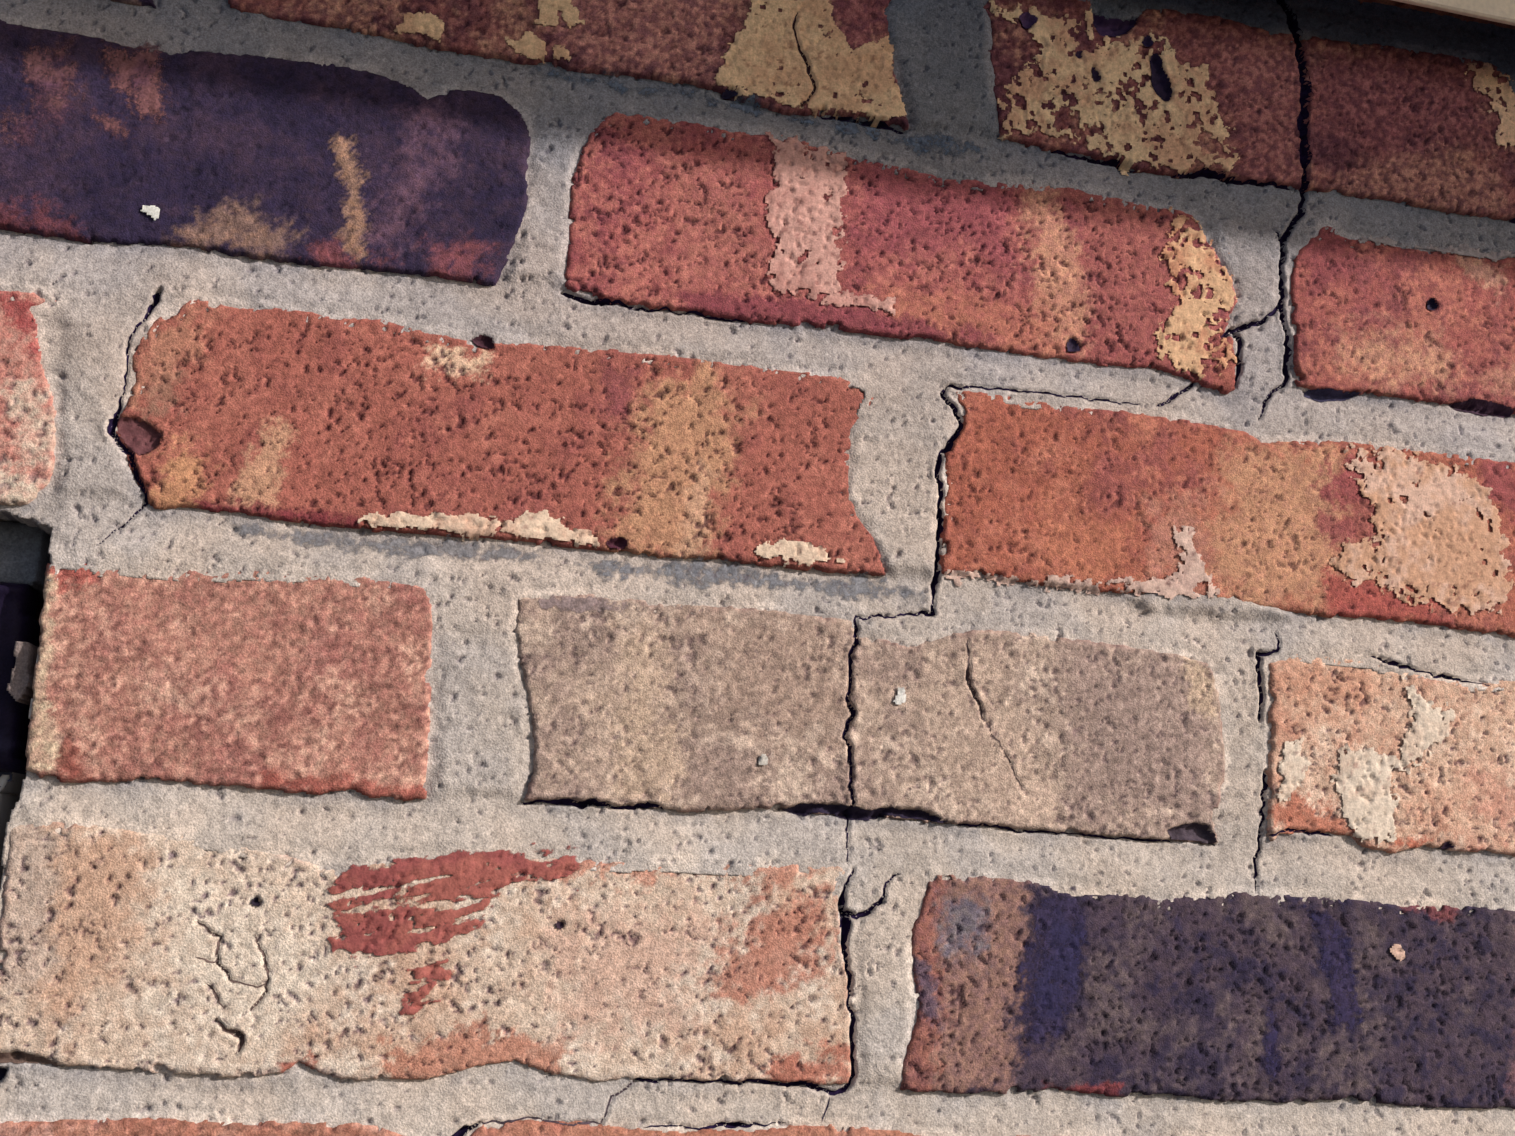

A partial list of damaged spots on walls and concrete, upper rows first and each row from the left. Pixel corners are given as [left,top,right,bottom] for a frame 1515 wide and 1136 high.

peeling [394,11,445,42]
peeling [505,0,585,64]
peeling [714,0,907,128]
peeling [989,0,1240,176]
peeling [1153,206,1238,380]
crack [1173,0,1313,419]
crack [99,292,161,544]
peeling [1329,441,1515,615]
crack [452,383,1194,1136]
crack [1255,633,1280,721]